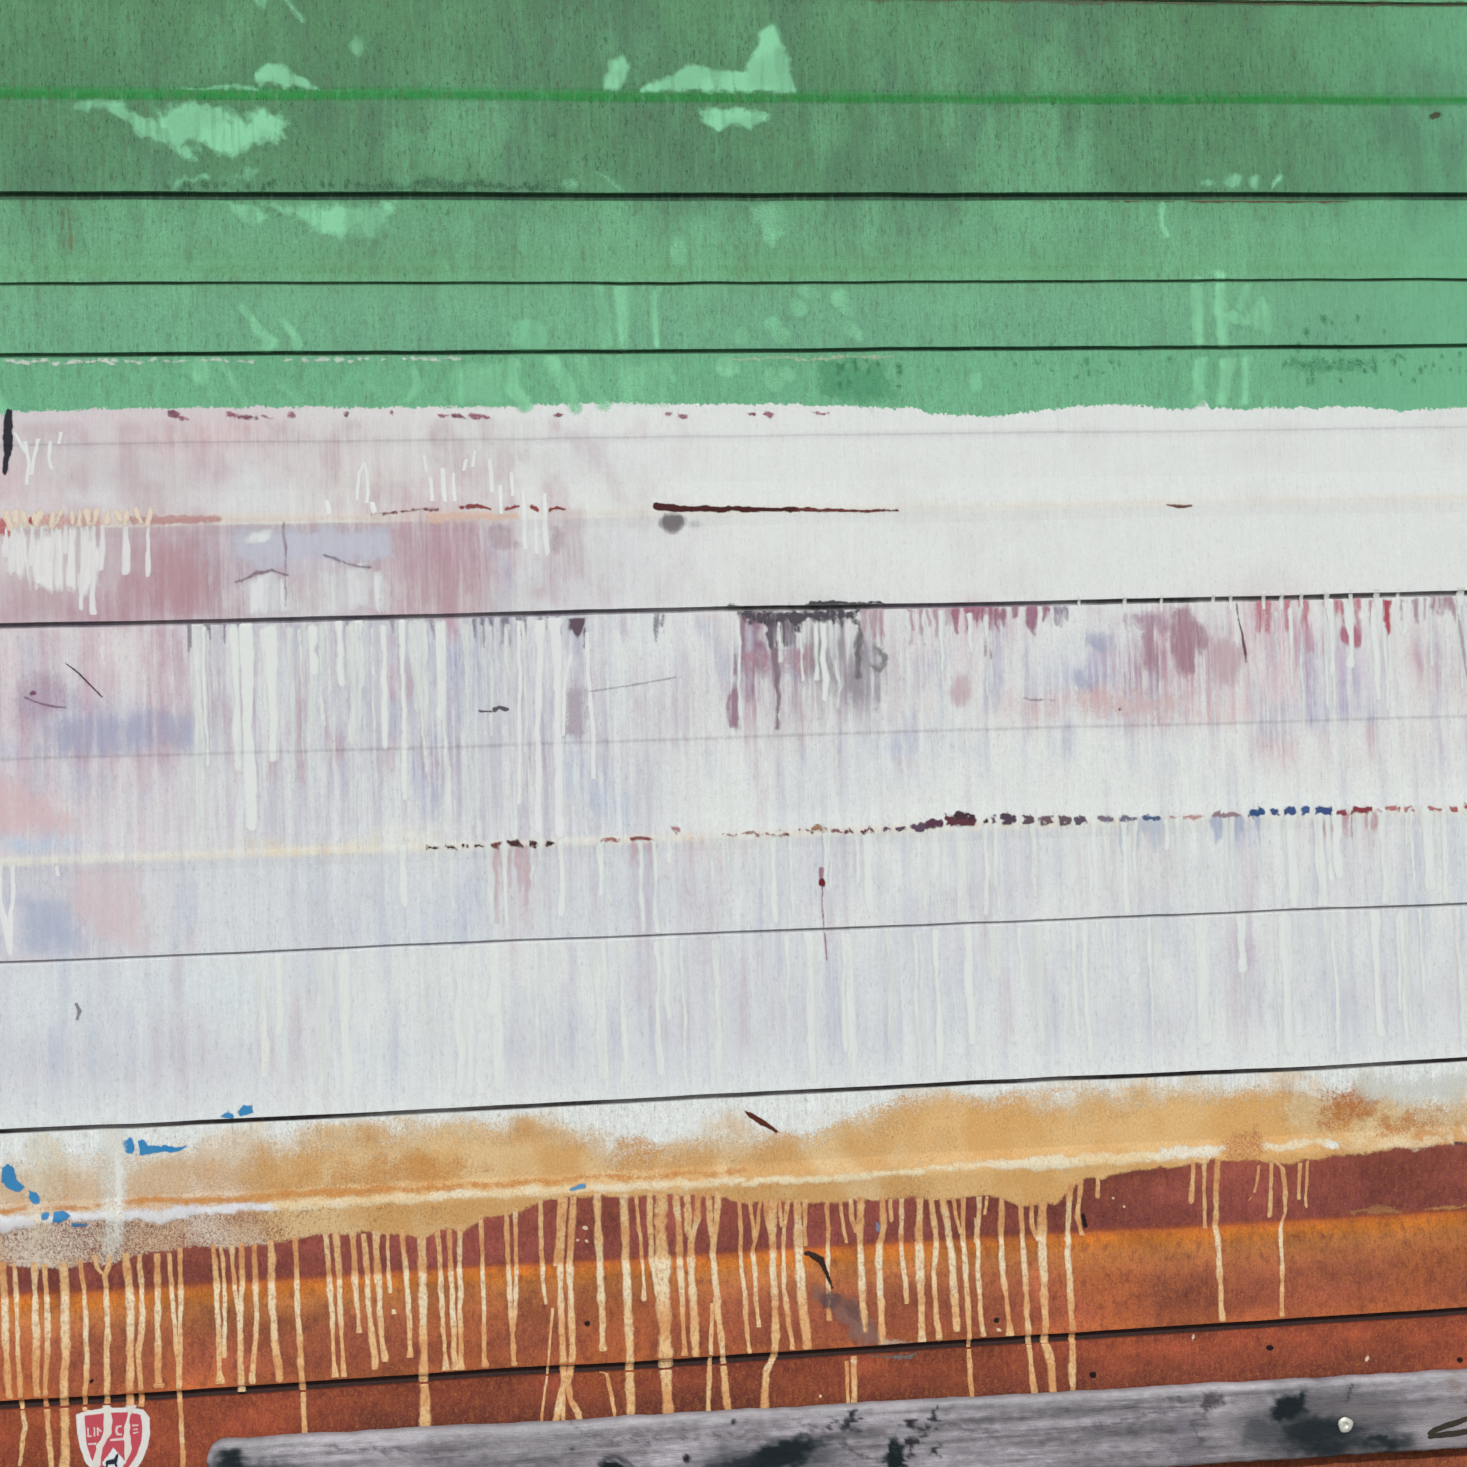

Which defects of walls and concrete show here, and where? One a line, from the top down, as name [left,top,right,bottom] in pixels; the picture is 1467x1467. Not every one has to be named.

water stain [0,506,154,615]
water stain [658,513,703,534]
water stain [726,591,1249,739]
water stain [186,450,596,1109]
water stain [0,865,16,955]
water stain [629,835,690,1090]
water stain [821,829,833,891]
water stain [839,931,859,1086]
water stain [912,819,1048,1077]
water stain [1057,804,1467,1072]
rust [0,1132,747,1216]
rust [1310,1077,1467,1146]